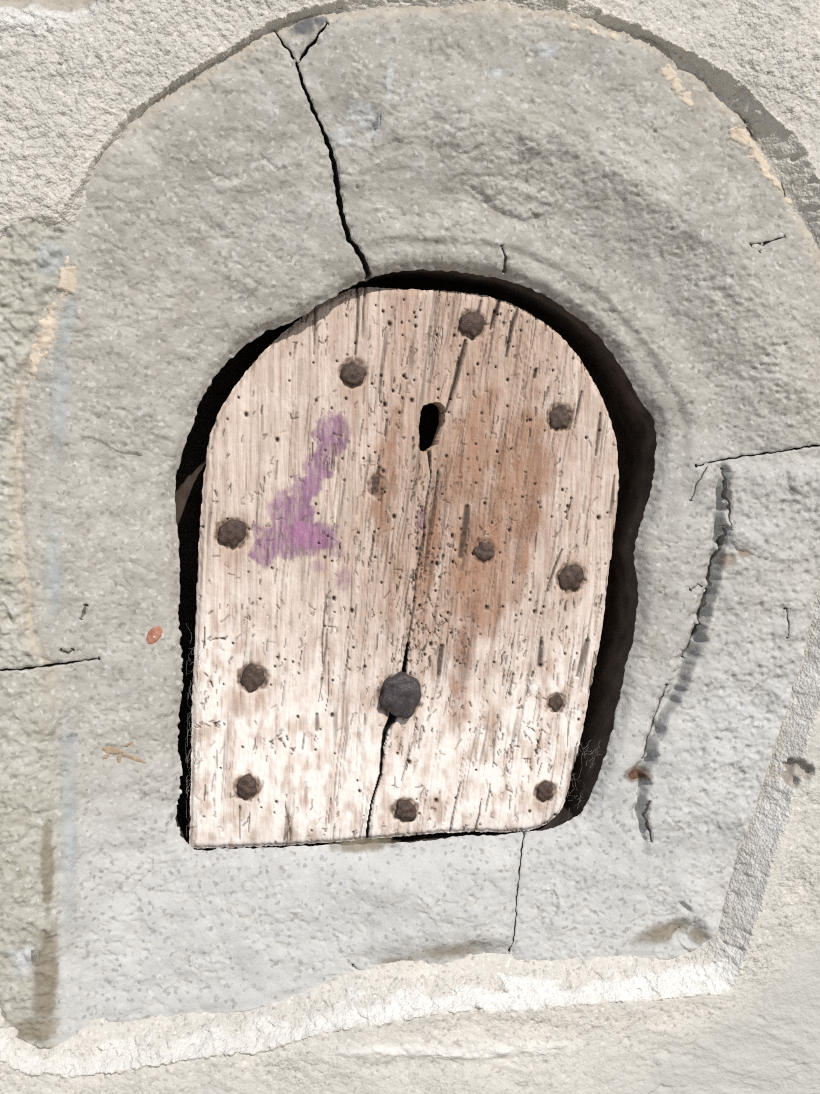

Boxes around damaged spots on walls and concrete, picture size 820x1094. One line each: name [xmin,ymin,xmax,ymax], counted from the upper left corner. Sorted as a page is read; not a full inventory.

crack [270,22,374,278]
crack [680,442,820,658]
crack [78,605,89,619]
crack [0,647,99,675]
crack [641,685,669,758]
crack [636,801,655,842]
crack [504,832,528,954]